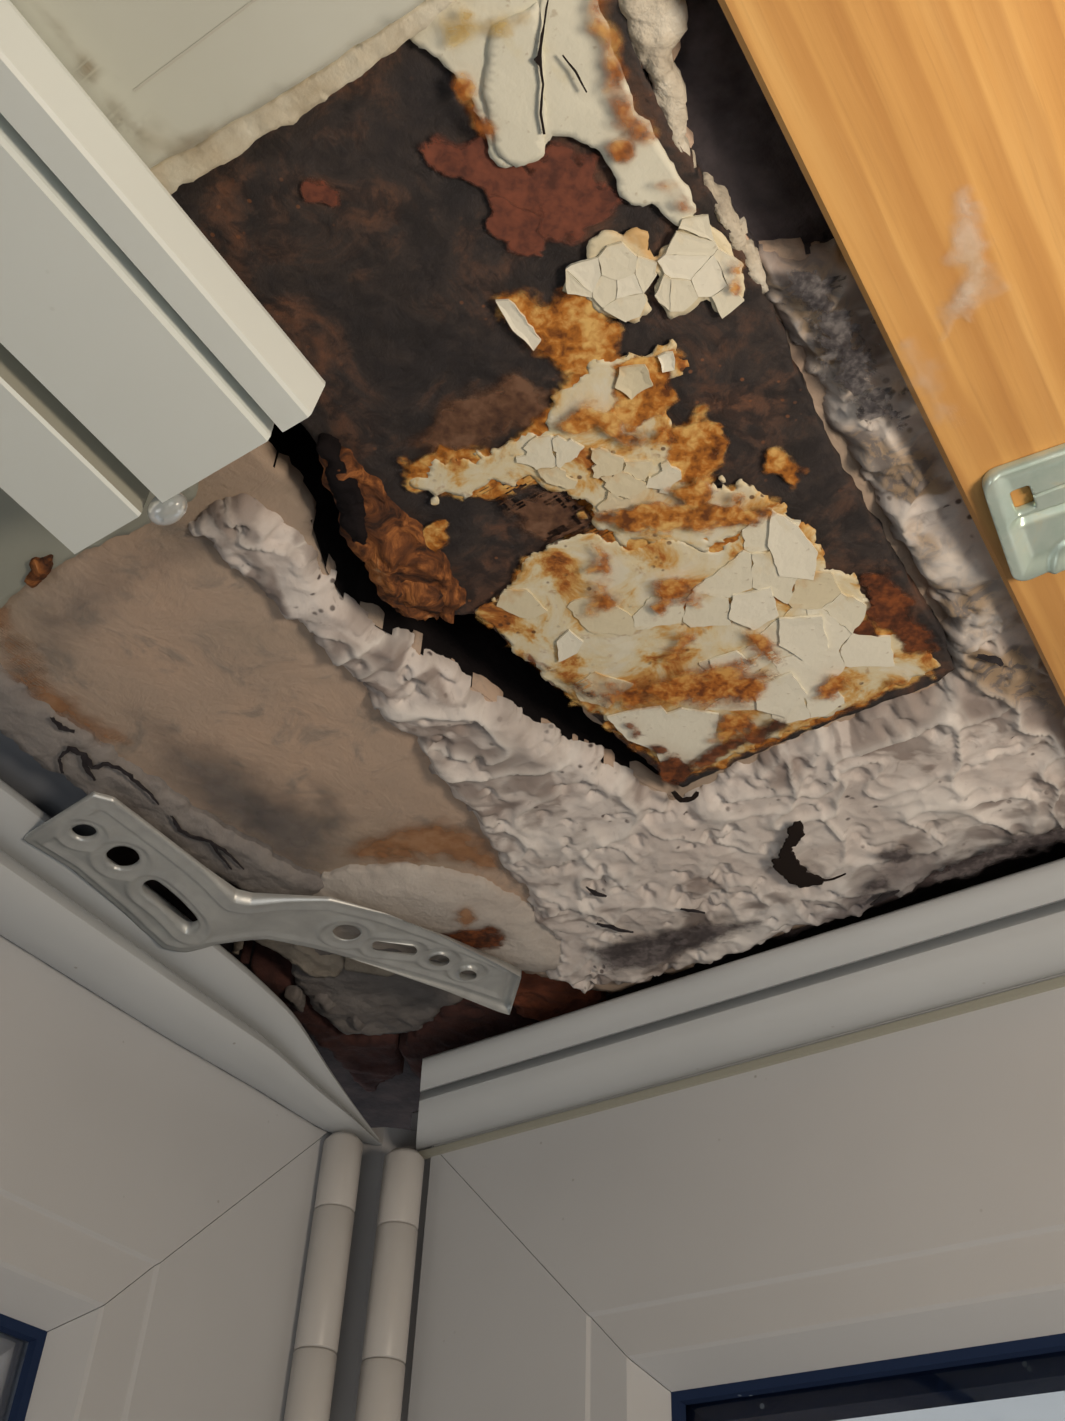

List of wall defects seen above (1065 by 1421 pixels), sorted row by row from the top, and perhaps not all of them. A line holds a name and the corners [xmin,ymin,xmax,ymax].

rust [421,0,657,257]
crack [534,0,587,134]
peeling [410,0,769,324]
peeling [496,299,541,351]
water stain [781,270,910,429]
rust [316,433,466,624]
rust [399,291,780,615]
peeling [409,339,941,772]
rust [765,447,807,486]
rust [853,574,939,654]
rust [523,634,933,785]
crack [50,717,244,870]